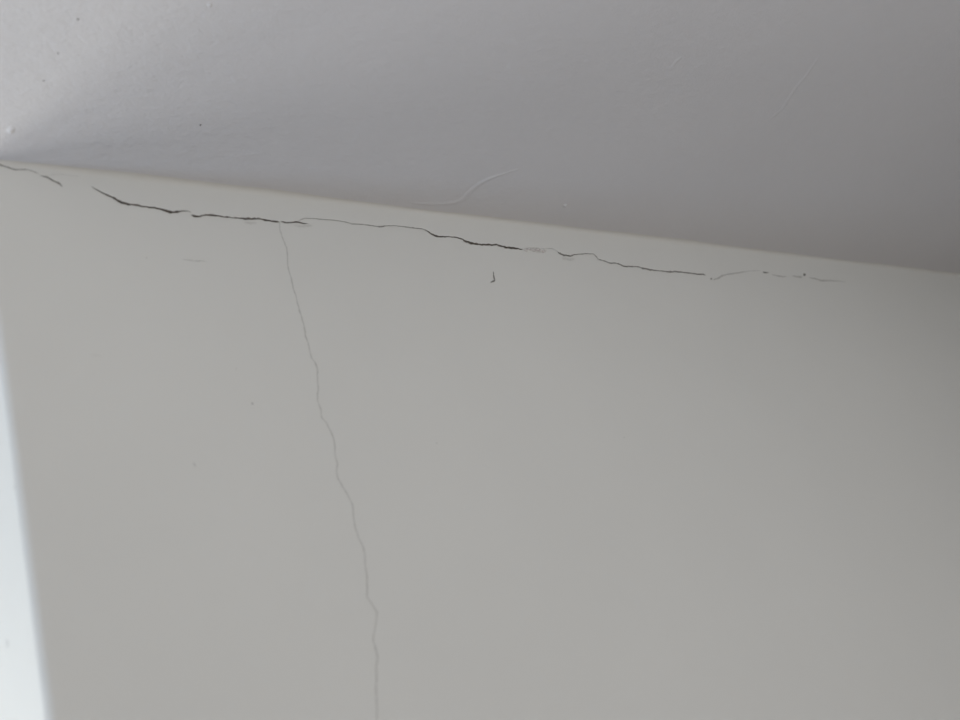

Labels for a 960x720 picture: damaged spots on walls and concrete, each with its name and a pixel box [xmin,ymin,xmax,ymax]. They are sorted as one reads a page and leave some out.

crack [93,187,522,250]
crack [558,252,712,279]